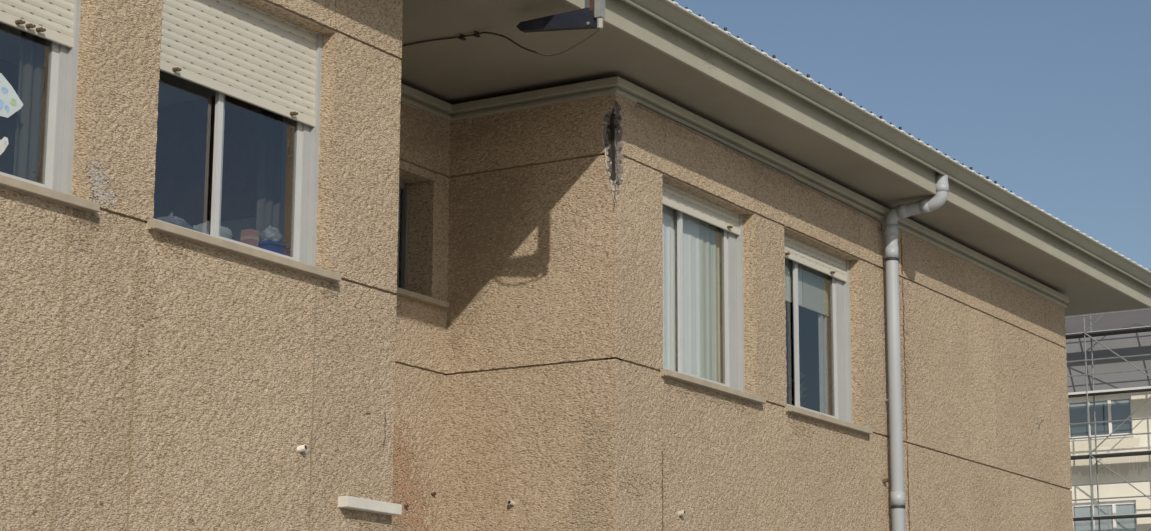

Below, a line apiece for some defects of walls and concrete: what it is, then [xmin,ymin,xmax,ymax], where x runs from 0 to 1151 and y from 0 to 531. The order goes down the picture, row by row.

spalling [601,101,623,203]